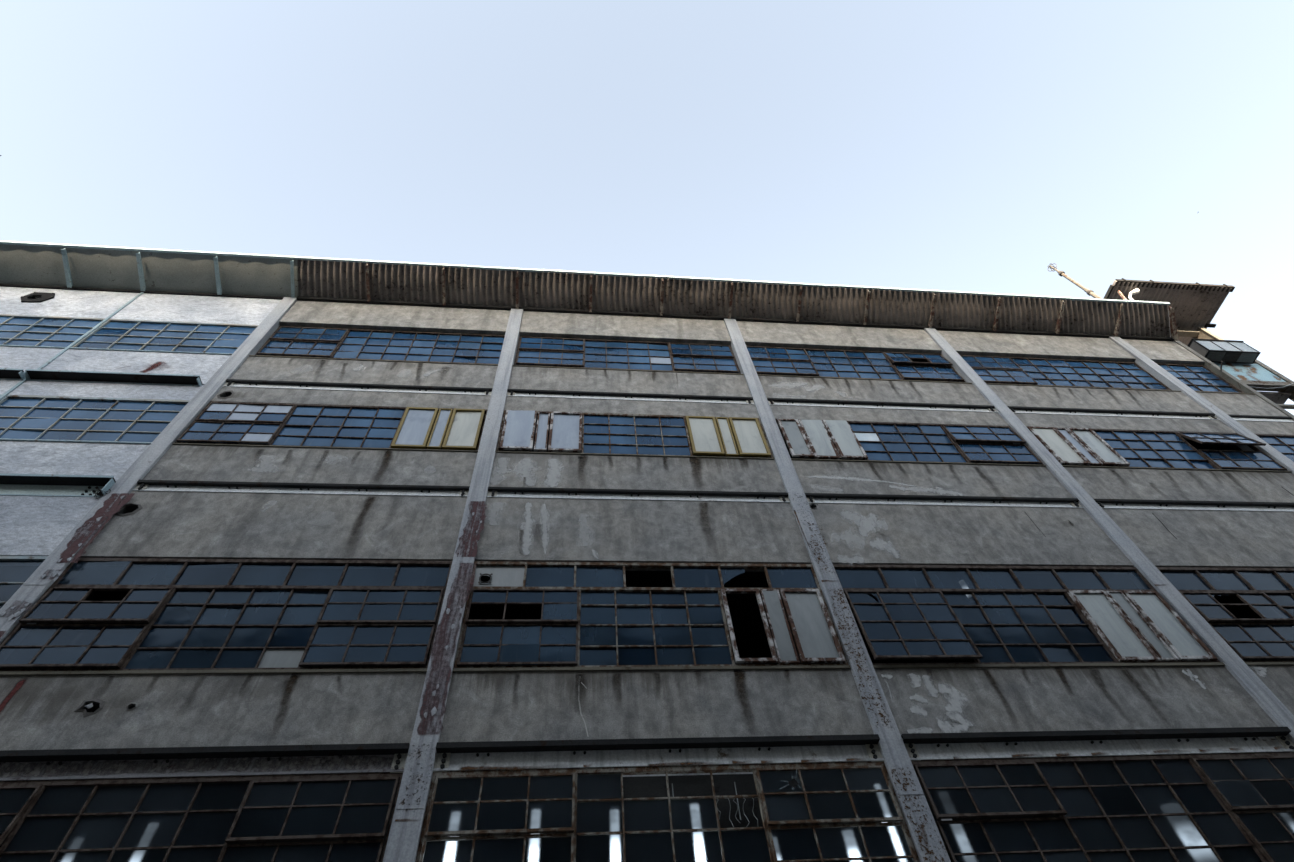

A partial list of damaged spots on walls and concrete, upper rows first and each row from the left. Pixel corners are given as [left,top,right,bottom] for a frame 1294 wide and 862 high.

water stain [490,458,561,487]
water stain [520,502,548,555]
corrosion [794,510,891,726]
corrosion [0,679,26,713]
corrosion [891,768,946,862]